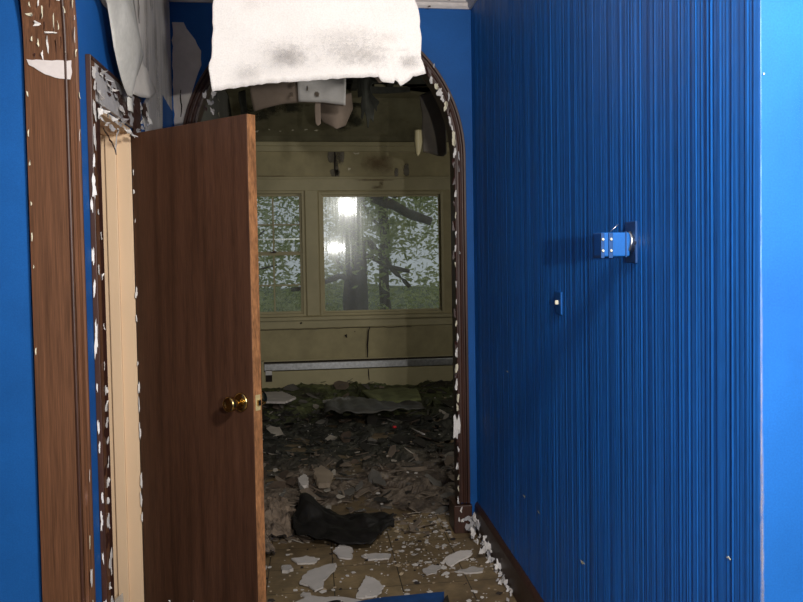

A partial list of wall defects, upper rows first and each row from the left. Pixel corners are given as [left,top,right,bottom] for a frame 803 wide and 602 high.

peeling [25,0,77,79]
flaking render [90,0,220,215]
peeling [421,56,460,167]
peeling [452,177,460,267]
peeling [96,383,114,602]
peeling [453,299,513,602]